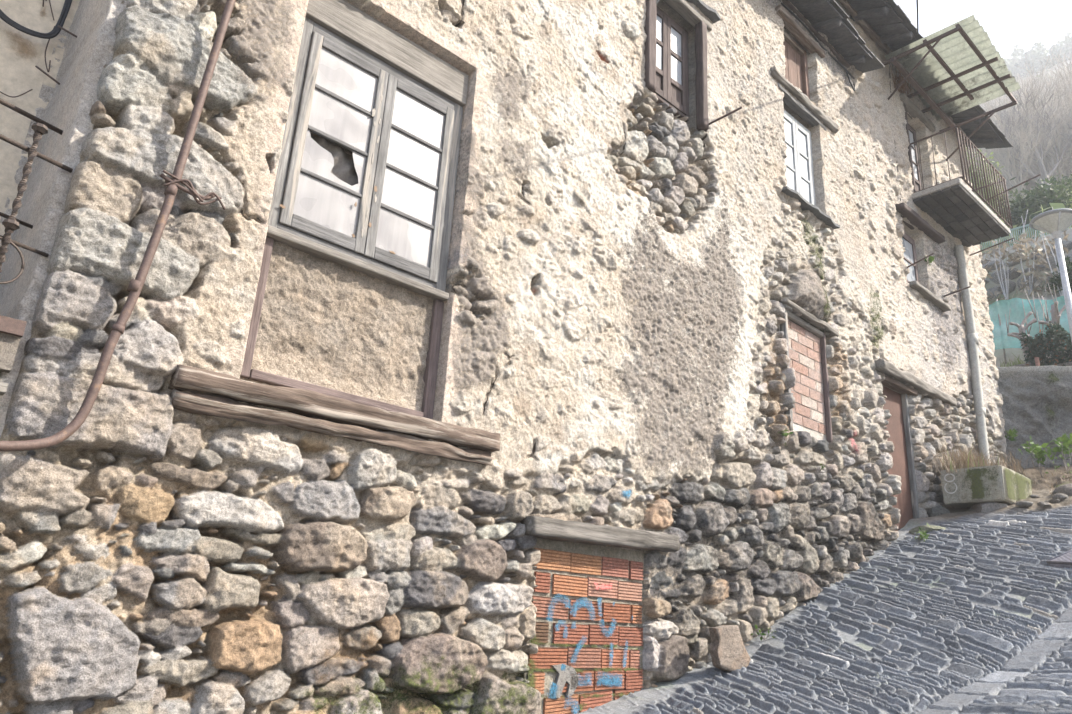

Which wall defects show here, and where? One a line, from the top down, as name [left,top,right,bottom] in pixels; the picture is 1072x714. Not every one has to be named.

flaking render [605,90,717,236]
crack [483,353,512,413]
flaking render [747,204,844,439]